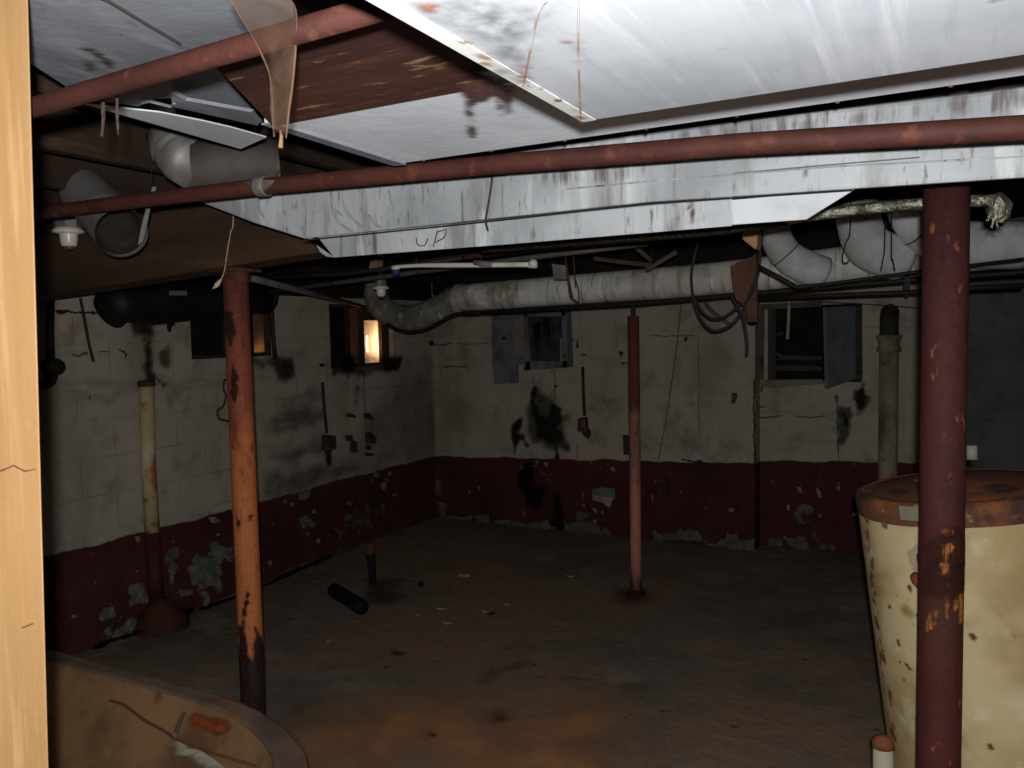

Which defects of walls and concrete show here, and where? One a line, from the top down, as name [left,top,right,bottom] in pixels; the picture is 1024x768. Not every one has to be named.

damp [511,387,569,460]
damp [835,383,870,467]
peeling [576,487,615,524]
rust [965,498,1024,528]
peeling [99,570,148,639]
peeling [164,517,234,626]
rust [855,473,919,706]